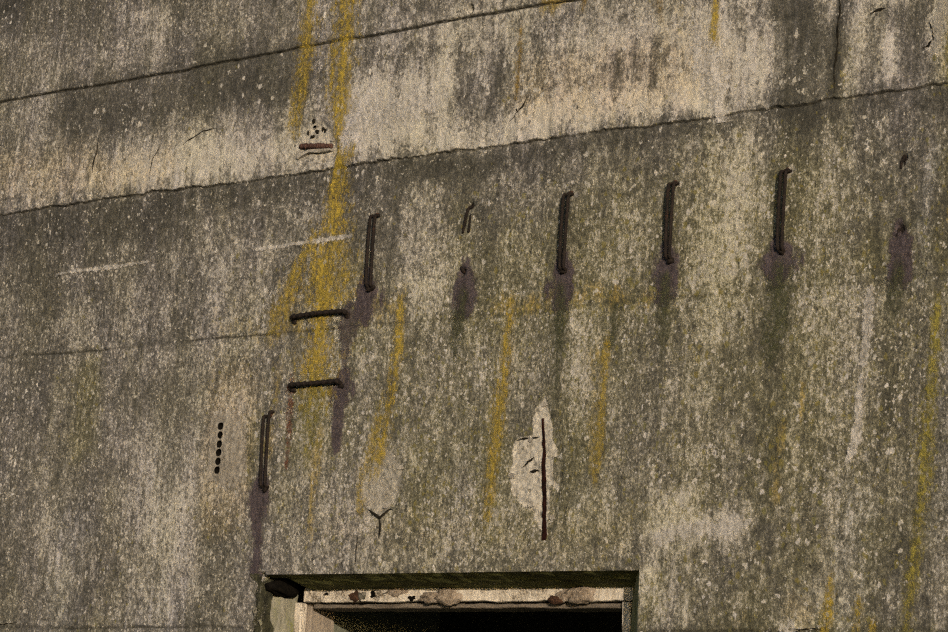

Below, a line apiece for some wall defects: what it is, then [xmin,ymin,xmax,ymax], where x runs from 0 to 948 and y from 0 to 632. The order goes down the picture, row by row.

crack [0,0,581,103]
crack [759,0,841,111]
crack [509,97,555,144]
spalling [510,395,559,540]